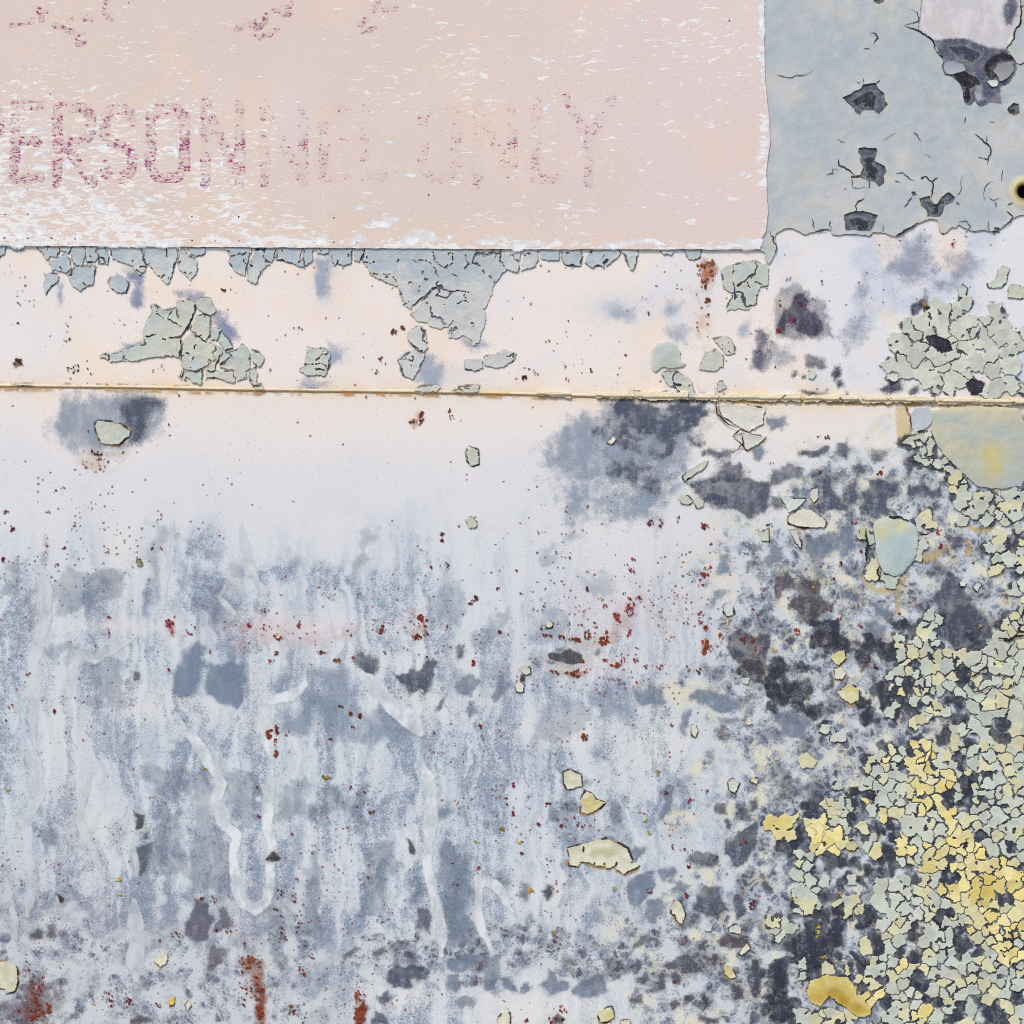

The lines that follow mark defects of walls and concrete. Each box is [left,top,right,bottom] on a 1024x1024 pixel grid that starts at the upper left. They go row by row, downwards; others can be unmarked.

crack [905,9,944,60]
peeling [919,0,1021,116]
crack [1006,0,1024,65]
crack [882,117,1013,236]
peeling [226,247,639,395]
corrosion [696,259,716,339]
damp [546,409,701,525]
corrosion [539,592,663,685]
peeling [562,260,1024,1024]
damp [173,643,424,916]
damp [410,758,515,958]
corrosion [239,940,265,1024]